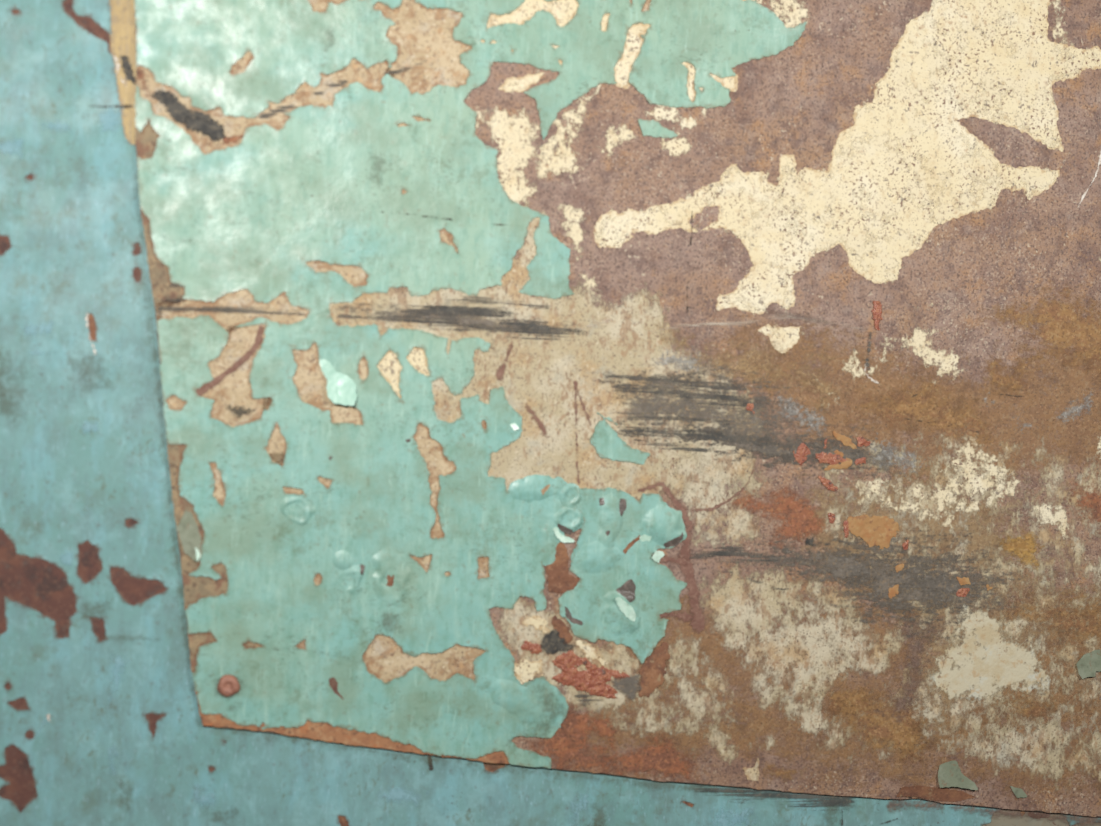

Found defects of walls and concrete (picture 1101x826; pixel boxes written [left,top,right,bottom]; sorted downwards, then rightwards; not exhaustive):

peeling [109,0,579,155]
peeling [155,289,309,427]
water stain [338,297,552,334]
water stain [603,355,770,406]
peeling [292,0,1101,547]
water stain [616,416,916,468]
corrosion [464,0,1101,819]
peeling [167,443,229,610]
corrosion [329,677,344,700]
corrosion [195,690,510,772]
peeling [496,597,738,763]
peeling [700,427,1101,790]